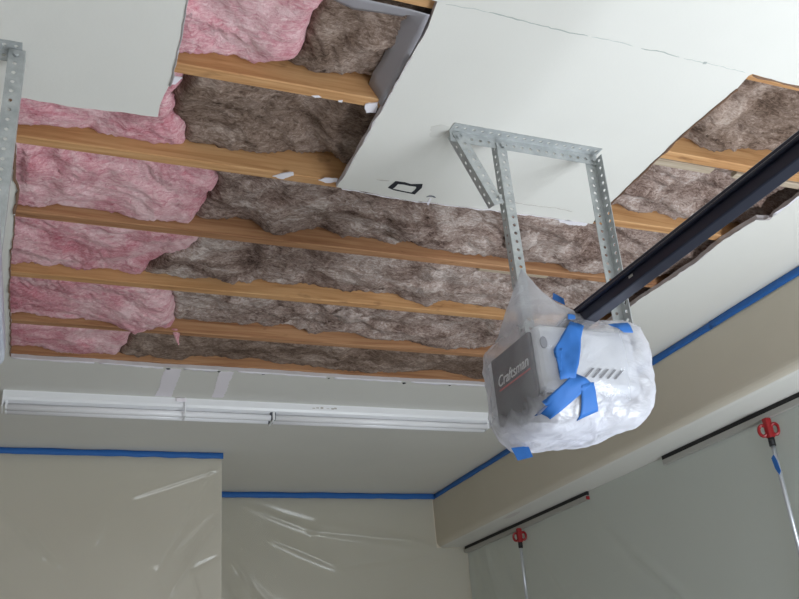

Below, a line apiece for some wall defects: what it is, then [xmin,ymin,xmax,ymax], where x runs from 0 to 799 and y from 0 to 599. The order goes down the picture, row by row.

crack [446,4,745,73]